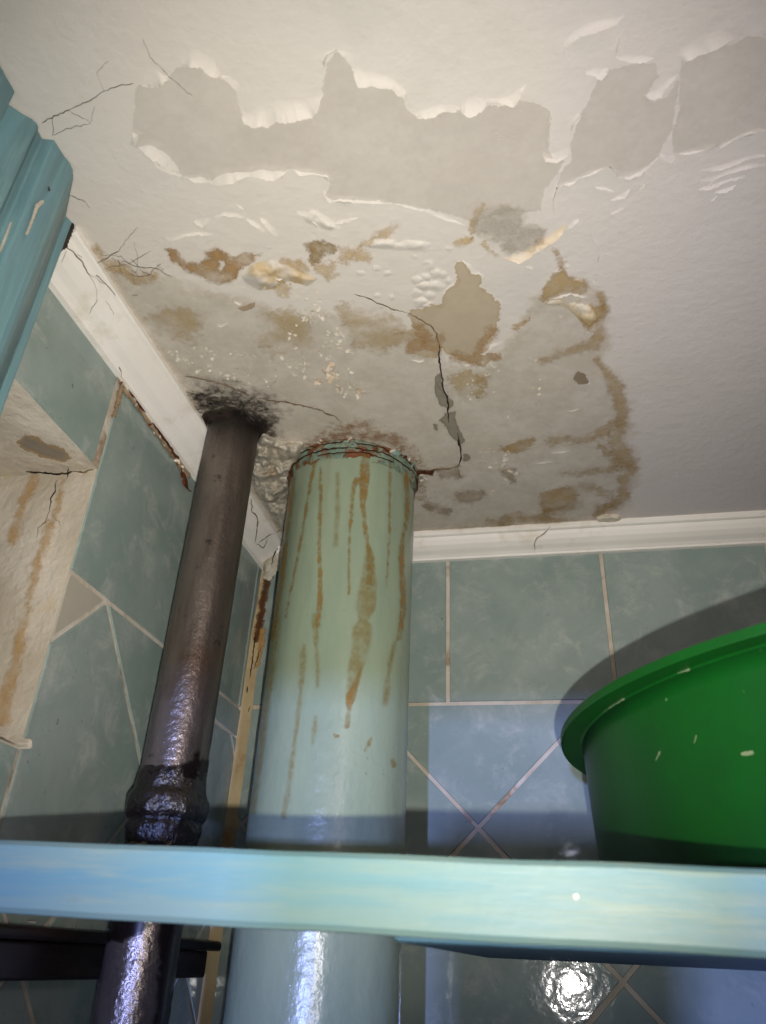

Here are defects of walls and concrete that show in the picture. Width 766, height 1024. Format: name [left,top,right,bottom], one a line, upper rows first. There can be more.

peeling [241,93,323,129]
peeling [323,49,526,120]
damp [167,248,255,283]
damp [297,241,334,266]
damp [542,271,586,299]
spalling [406,261,503,400]
crack [185,294,462,492]
crack [26,468,92,538]
flaking render [251,434,322,534]
corrosion [308,425,434,640]
corrosion [247,462,322,692]
corrosion [346,660,361,709]